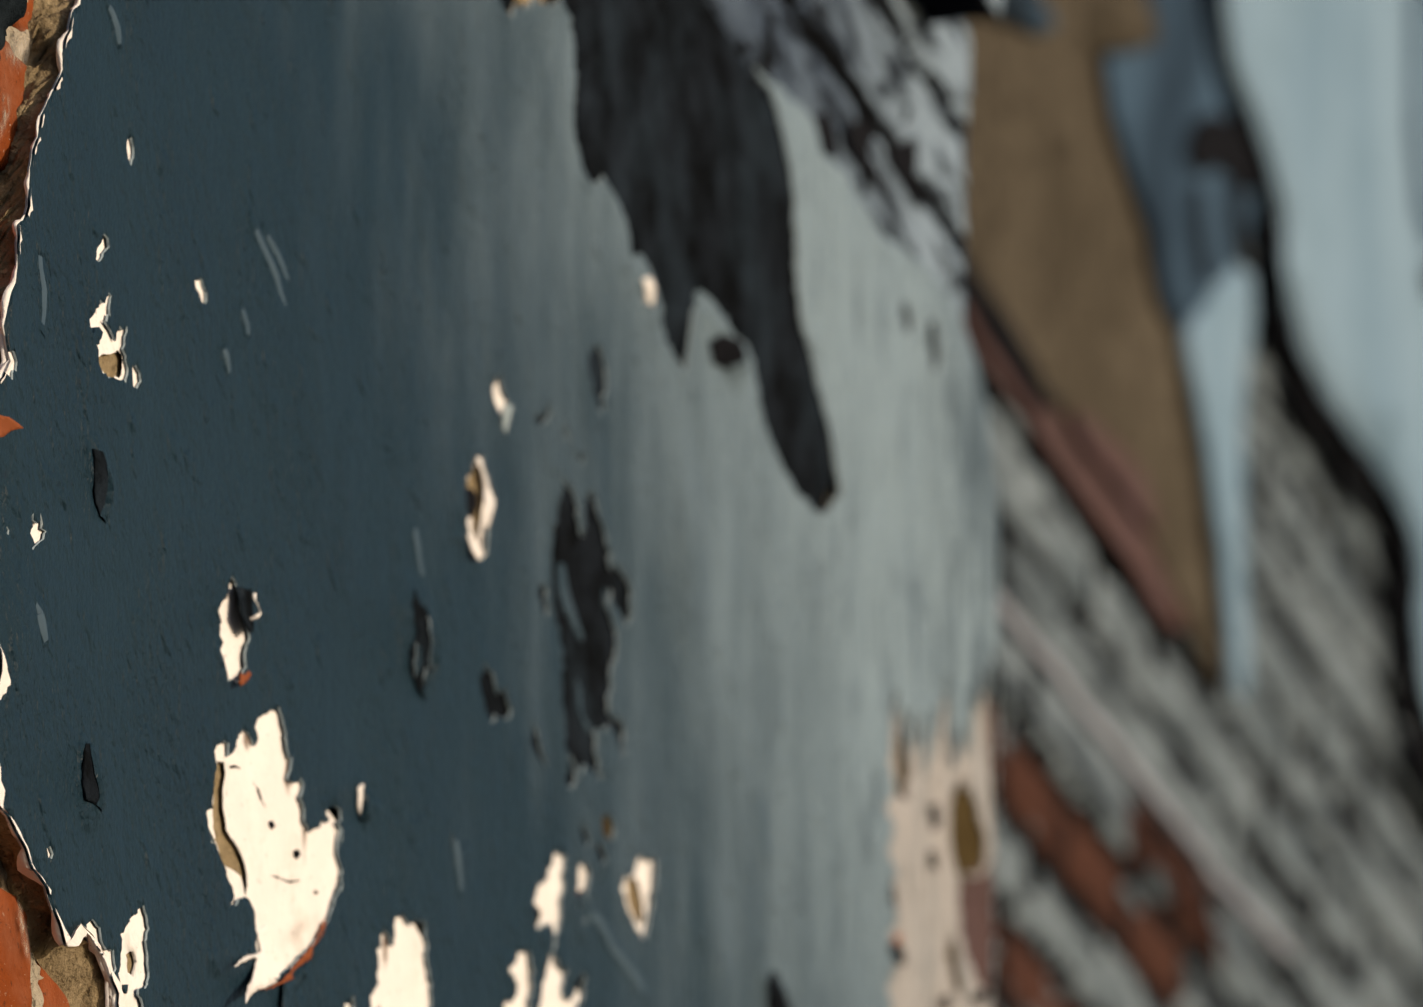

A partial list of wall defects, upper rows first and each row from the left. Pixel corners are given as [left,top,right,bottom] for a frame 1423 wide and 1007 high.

spalling [0,0,80,383]
peeling [90,295,139,388]
peeling [553,0,832,512]
spalling [965,0,1255,700]
spalling [0,646,11,700]
peeling [219,579,262,686]
peeling [538,482,624,786]
spalling [0,767,147,1007]
peeling [207,710,341,1007]
peeling [370,916,430,1007]
peeling [504,814,613,1007]
peeling [886,673,995,1007]